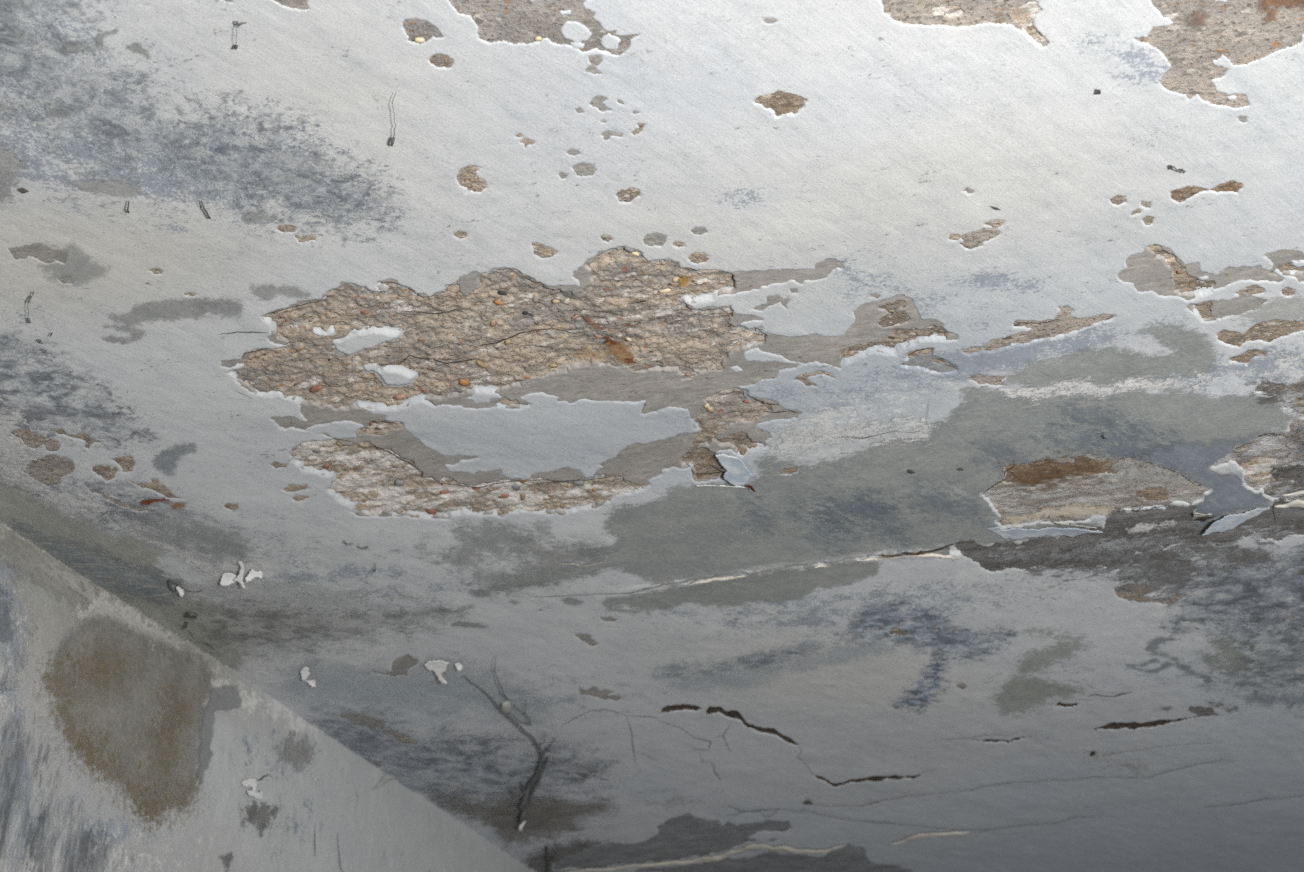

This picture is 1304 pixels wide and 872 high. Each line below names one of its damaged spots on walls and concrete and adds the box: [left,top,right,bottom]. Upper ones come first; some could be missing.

damp [0,0,407,247]
spalling [449,0,638,74]
spalling [881,0,1049,47]
spalling [1110,195,1154,225]
spalling [1170,181,1242,202]
spalling [1134,0,1304,123]
spalling [221,225,1115,519]
peeling [932,244,1304,605]
damp [416,325,1304,719]
damp [0,326,620,872]
crack [566,692,1228,833]
peeling [553,813,913,872]